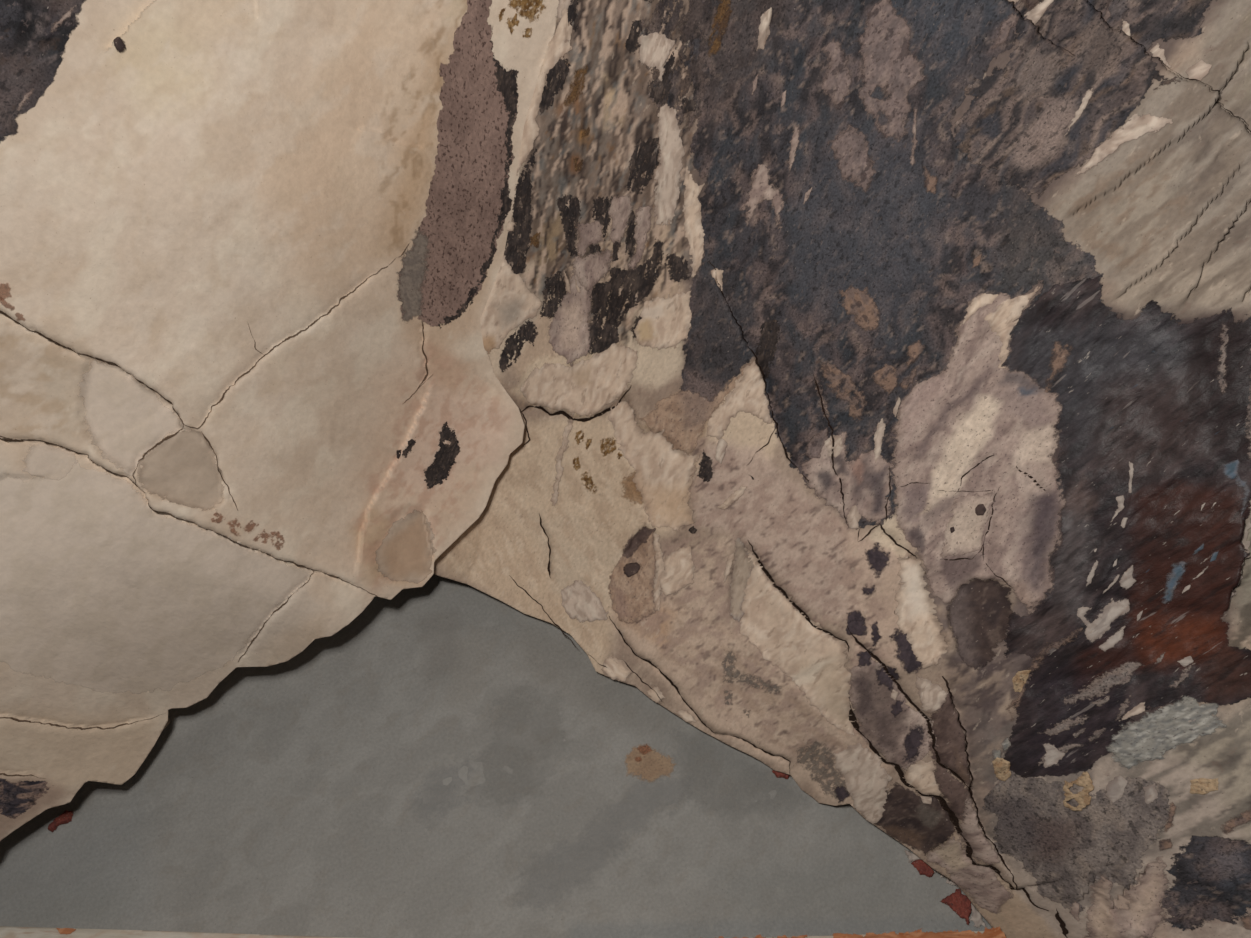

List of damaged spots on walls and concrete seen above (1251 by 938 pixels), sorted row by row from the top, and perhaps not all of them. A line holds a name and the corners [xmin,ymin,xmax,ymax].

damp [504,149,537,274]
crack [0,244,409,662]
crack [709,262,1046,588]
crack [0,715,159,730]
spalling [601,656,633,682]
spalling [647,687,697,722]
spalling [724,537,941,824]
crack [748,541,1069,937]
damp [846,611,972,855]
damp [946,578,1012,670]
damp [1107,696,1227,770]
spalling [833,798,1013,938]